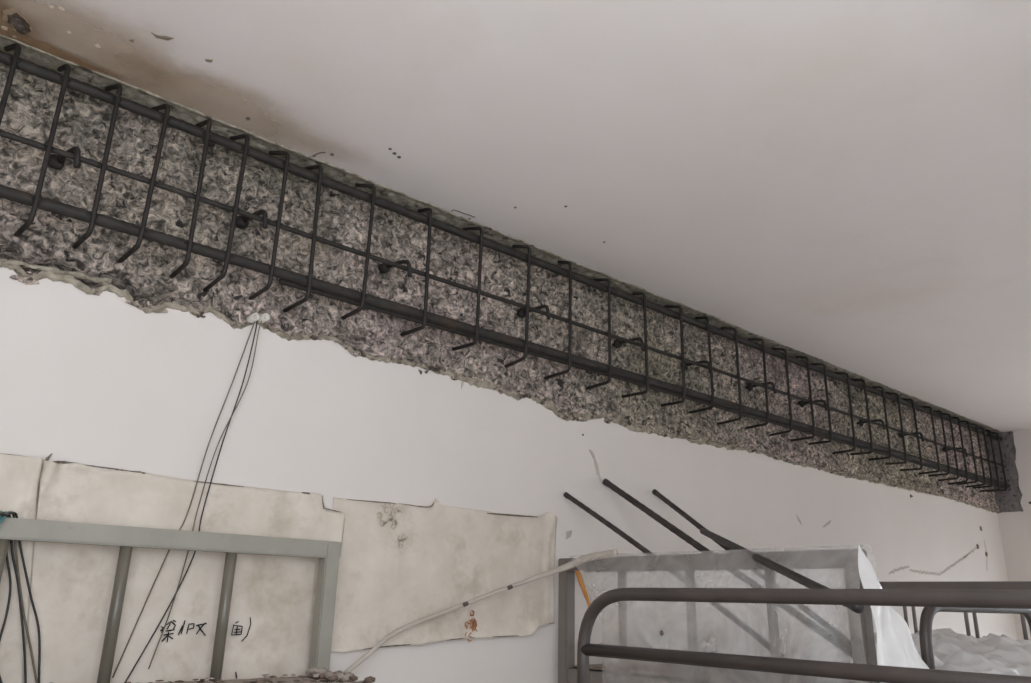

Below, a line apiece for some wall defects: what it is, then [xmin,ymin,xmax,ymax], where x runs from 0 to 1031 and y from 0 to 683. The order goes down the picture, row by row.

leakage [0,6,108,73]
spalling [0,7,1031,514]